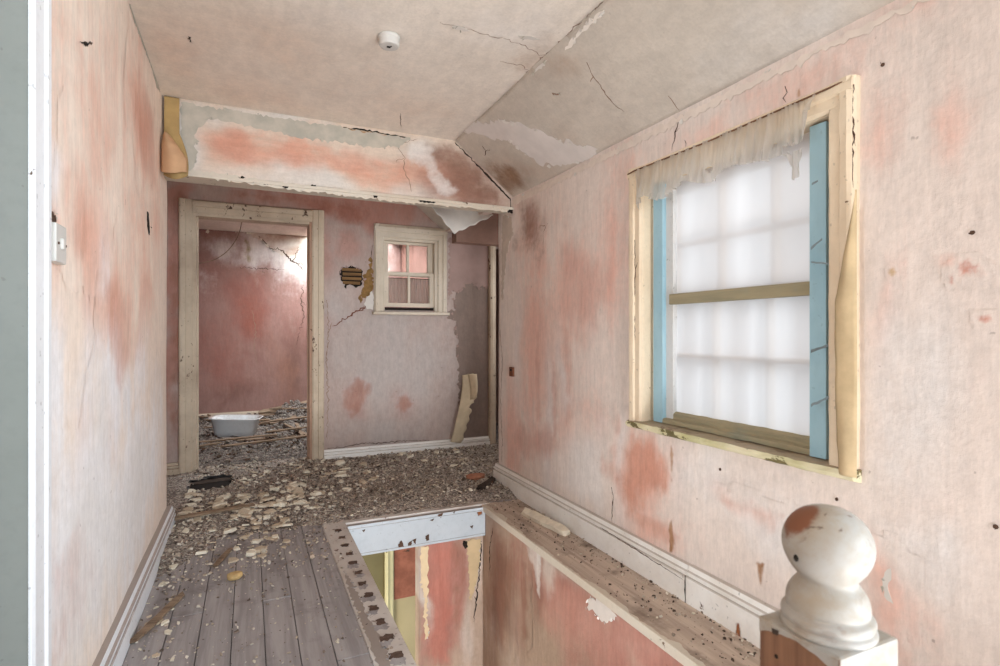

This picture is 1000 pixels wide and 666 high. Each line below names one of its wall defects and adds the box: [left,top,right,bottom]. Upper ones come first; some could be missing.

peeling [129,4,513,214]
crack [343,113,414,188]
crack [440,2,603,95]
peeling [464,119,597,168]
crack [240,236,429,449]
spalling [339,257,374,310]
damp [196,118,629,479]
flaking render [447,283,488,438]
damp [595,402,685,559]
spalling [586,596,617,624]